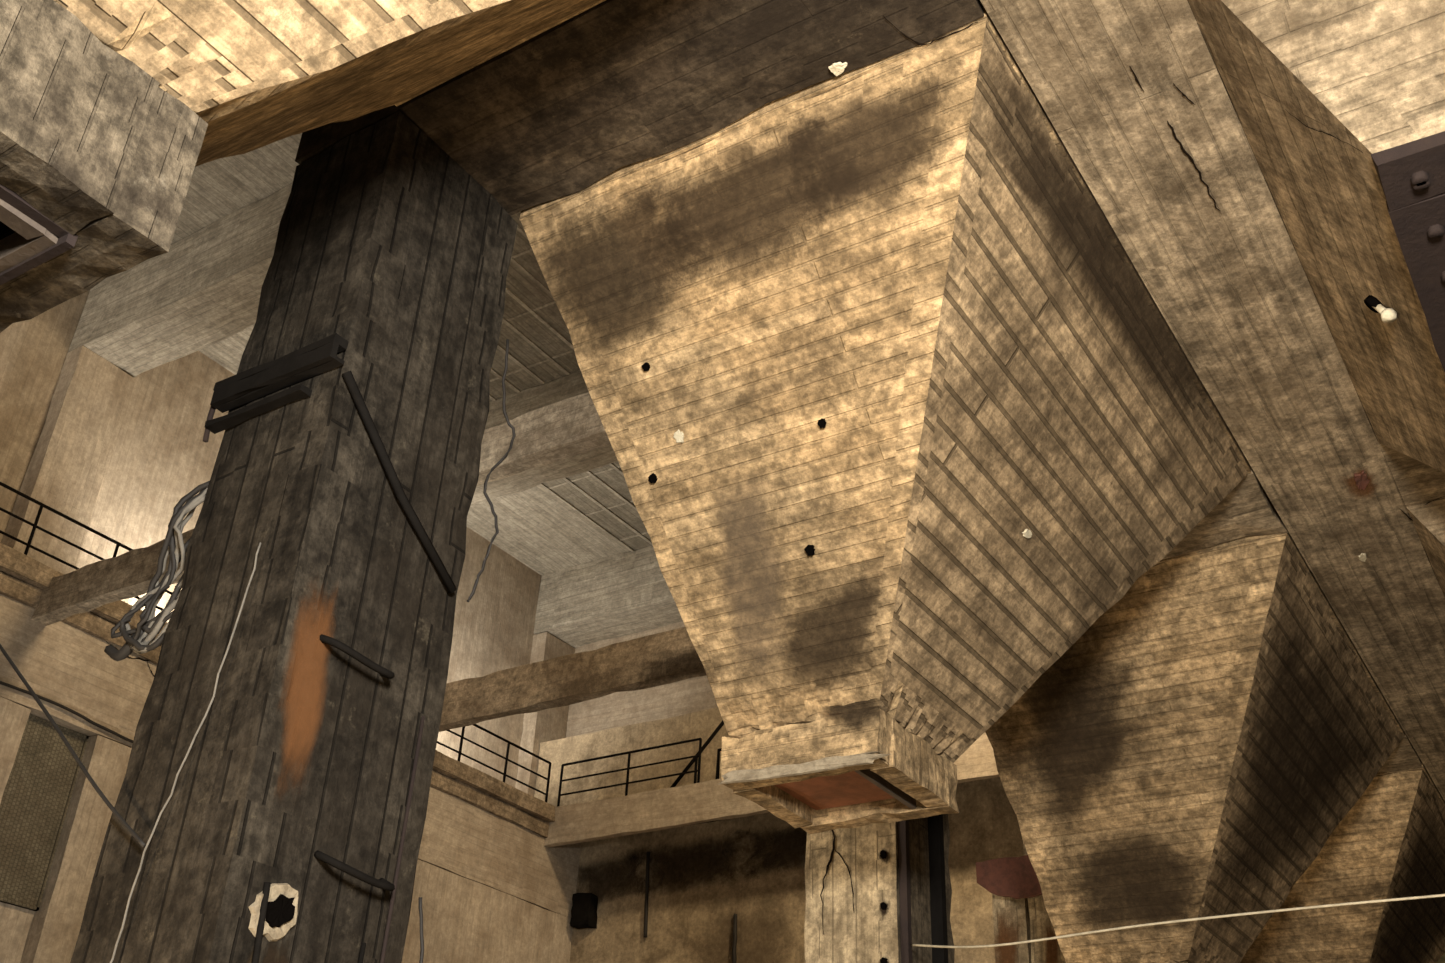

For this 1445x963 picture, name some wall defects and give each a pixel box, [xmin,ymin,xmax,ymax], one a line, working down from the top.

rust [286,608,331,760]